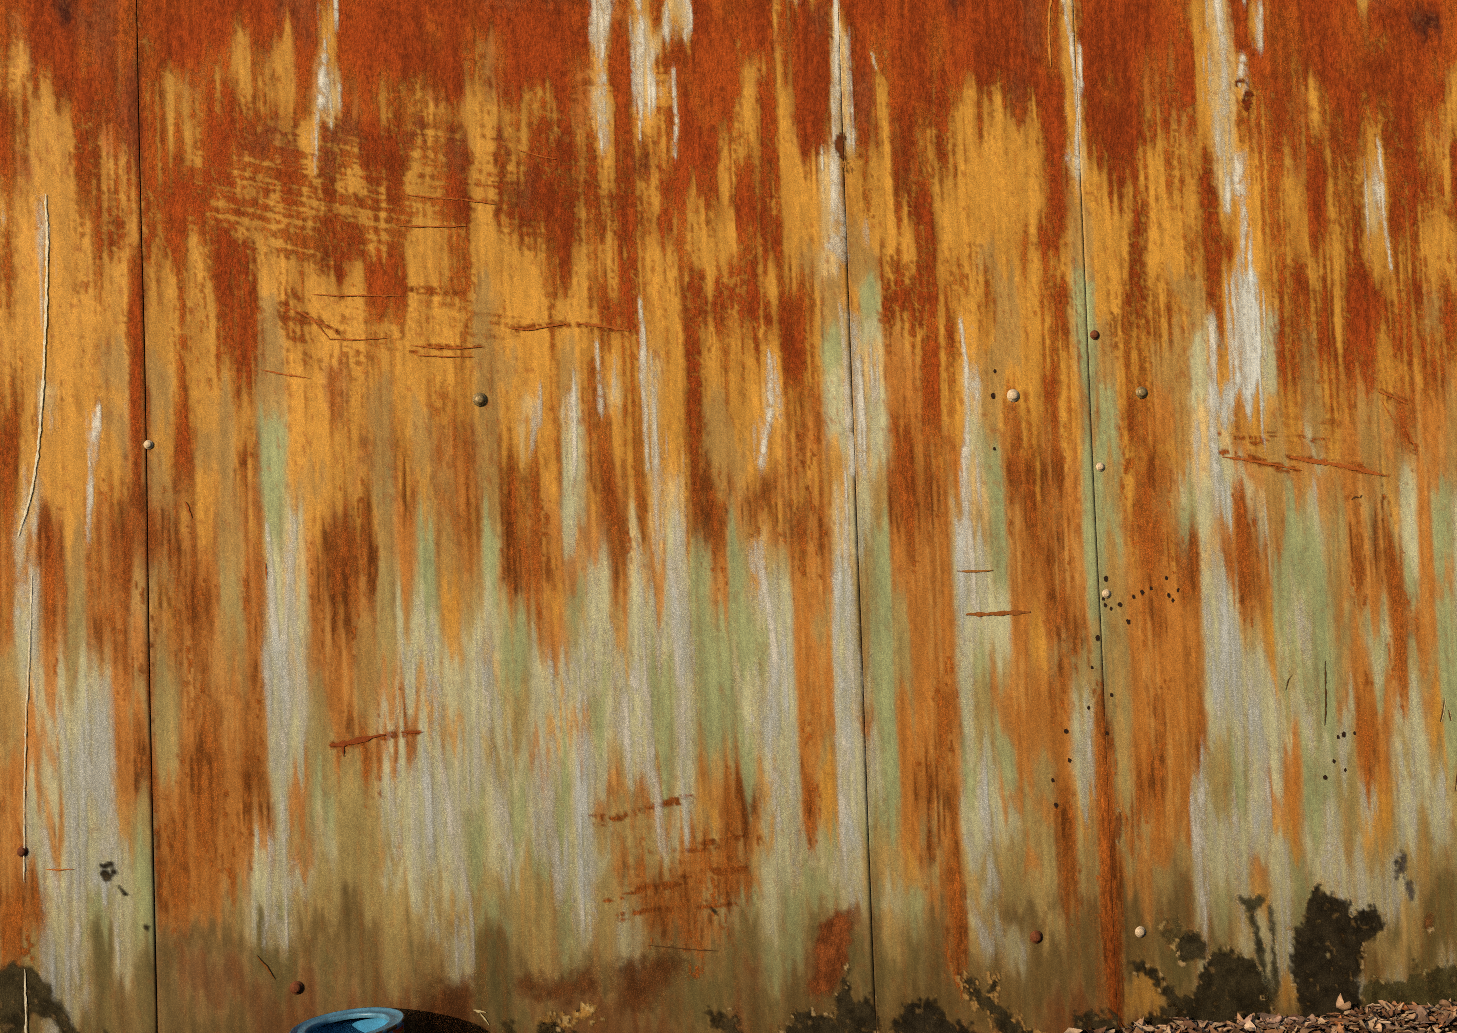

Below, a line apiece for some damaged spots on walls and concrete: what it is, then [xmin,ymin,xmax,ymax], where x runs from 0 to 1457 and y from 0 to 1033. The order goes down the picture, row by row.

rust [1218,0,1457,473]
rust [0,0,1233,910]
rust [1229,489,1262,626]
rust [1348,475,1418,709]
rust [0,869,72,961]
rust [604,765,760,1008]
rust [808,912,852,995]
rust [914,657,967,995]
rust [1055,679,1166,1033]